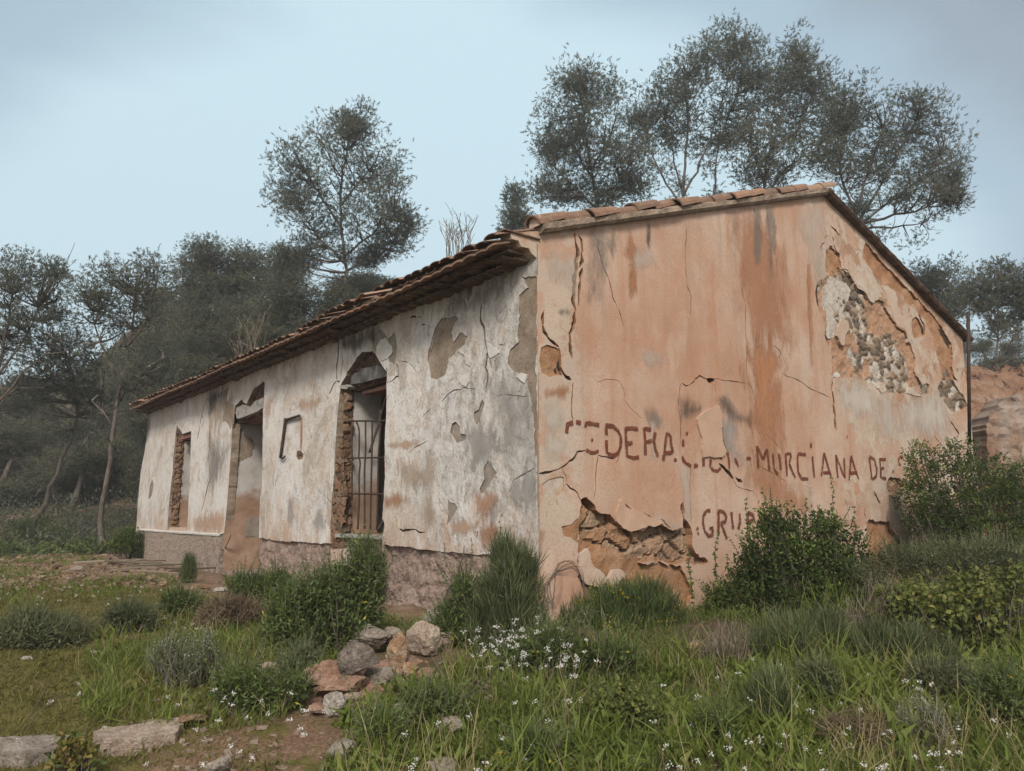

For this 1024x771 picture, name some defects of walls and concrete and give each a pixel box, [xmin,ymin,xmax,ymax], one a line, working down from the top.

peeling [428,316,471,387]
peeling [486,276,560,455]
crack [541,240,582,417]
damp [742,211,784,459]
spalling [816,244,966,412]
peeling [223,386,265,462]
peeling [452,422,466,442]
peeling [481,461,497,493]
spalling [561,498,704,609]